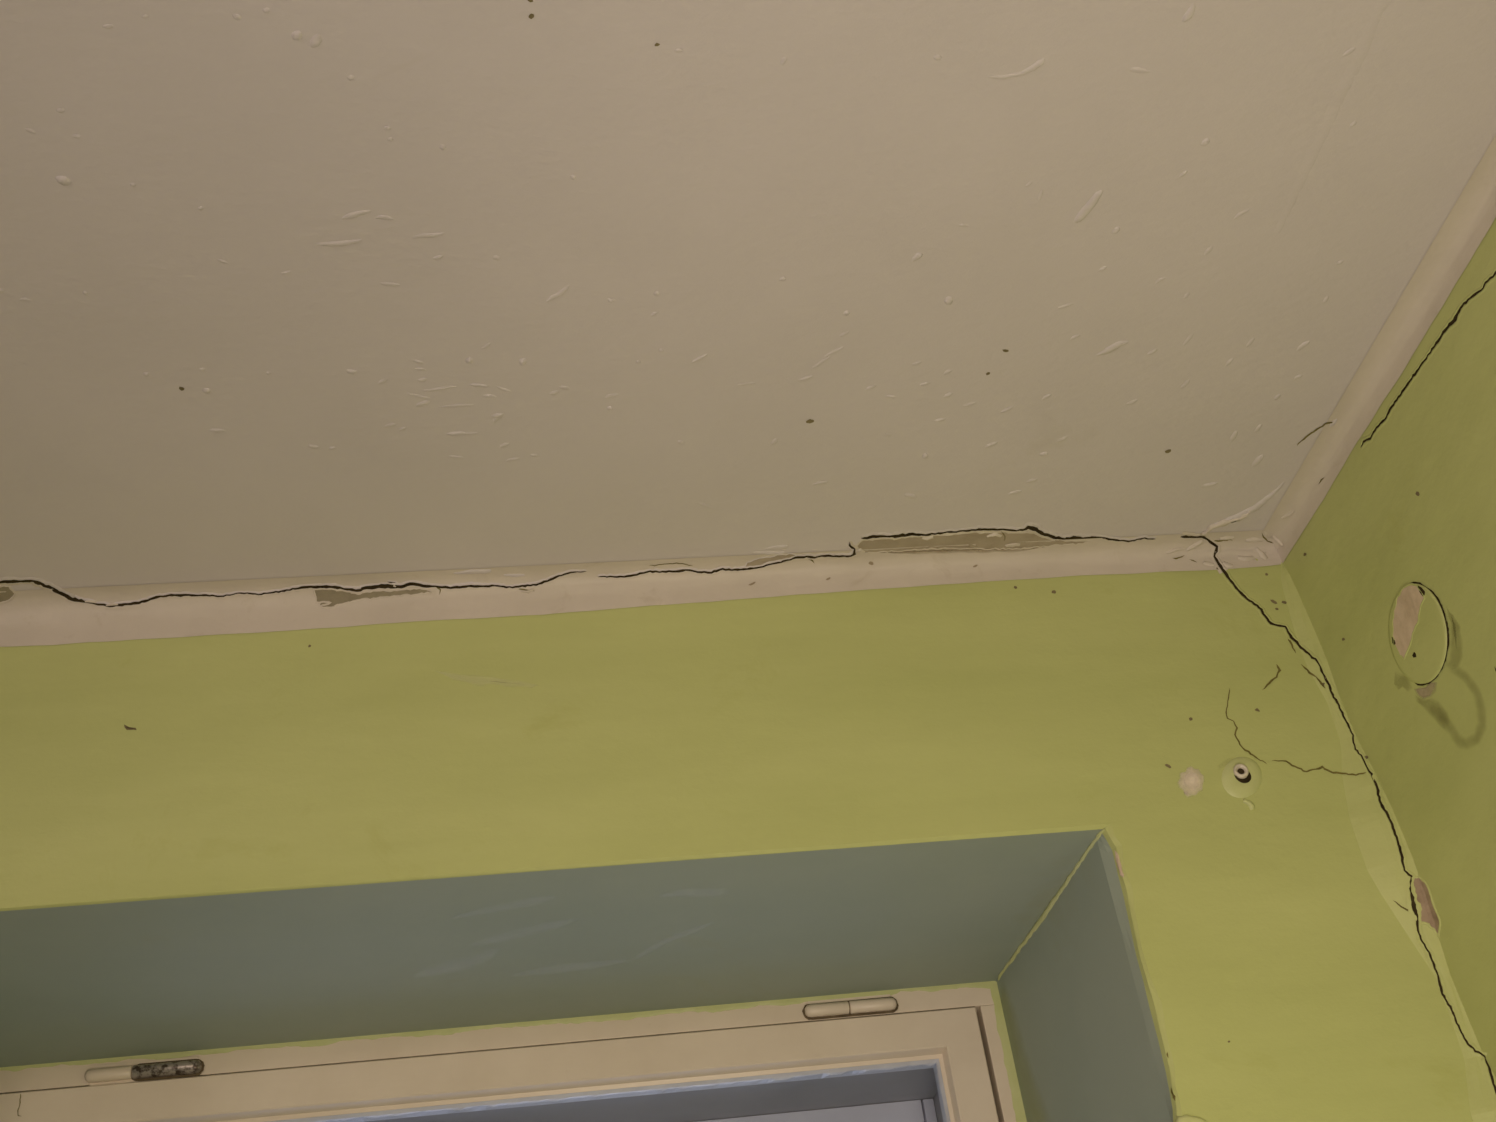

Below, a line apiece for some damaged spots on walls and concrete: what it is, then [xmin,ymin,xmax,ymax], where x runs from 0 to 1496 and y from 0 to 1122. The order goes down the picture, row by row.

crack [1297,267,1496,449]
peeling [1392,585,1425,658]
crack [0,522,1496,1103]
peeling [1411,876,1441,938]